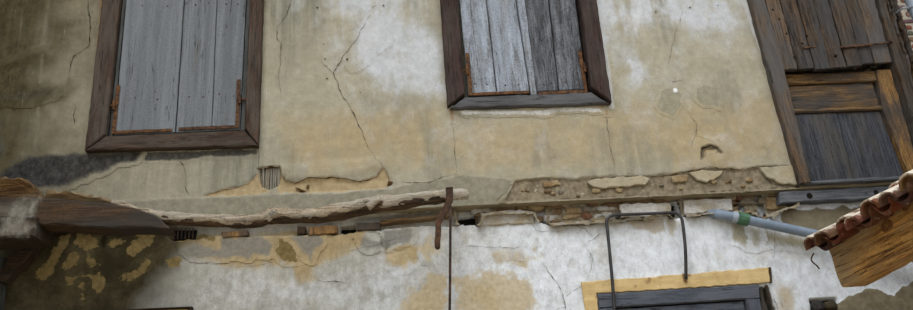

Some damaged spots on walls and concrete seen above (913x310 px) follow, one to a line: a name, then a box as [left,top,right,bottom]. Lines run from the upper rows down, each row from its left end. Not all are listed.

leakage [0,0,63,152]
crack [281,6,457,184]
crack [179,151,259,196]
spalling [201,166,394,198]
peeling [26,225,328,308]
crack [534,225,596,309]
spalling [342,145,803,310]
spalling [809,300,838,310]